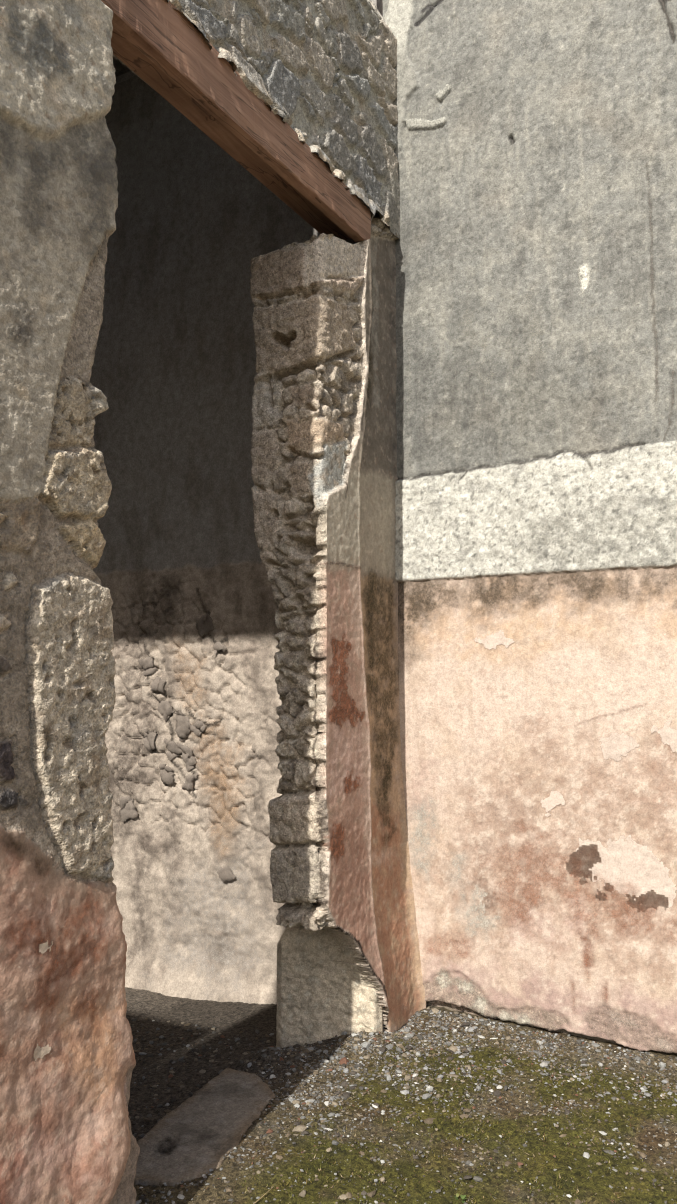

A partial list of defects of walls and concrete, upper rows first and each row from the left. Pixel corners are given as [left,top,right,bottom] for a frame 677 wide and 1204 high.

water stain [476,577,536,605]
peeling [474,630,515,650]
water stain [367,575,457,838]
peeling [650,719,677,752]
peeling [540,788,565,817]
peeling [576,835,677,908]
spalling [423,970,568,1031]
spalling [586,1006,677,1053]